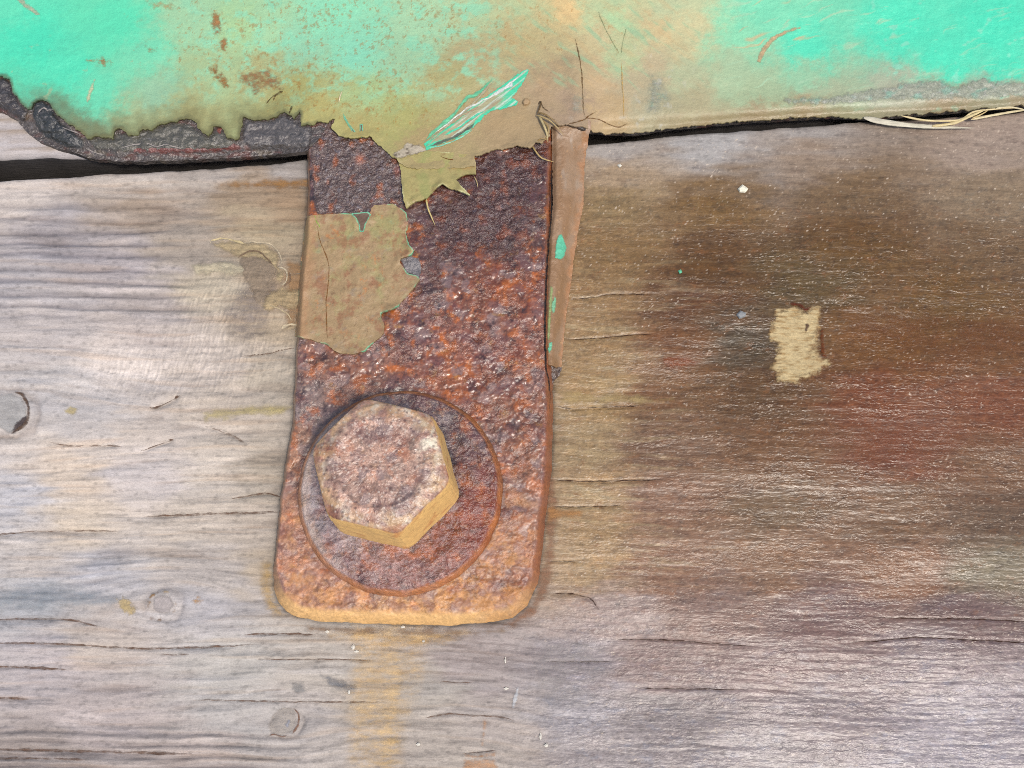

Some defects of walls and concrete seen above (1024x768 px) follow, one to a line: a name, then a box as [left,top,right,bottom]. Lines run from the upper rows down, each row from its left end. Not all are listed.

corrosion [0,78,311,155]
corrosion [243,71,279,94]
peeling [193,117,591,399]
peeling [769,303,830,384]